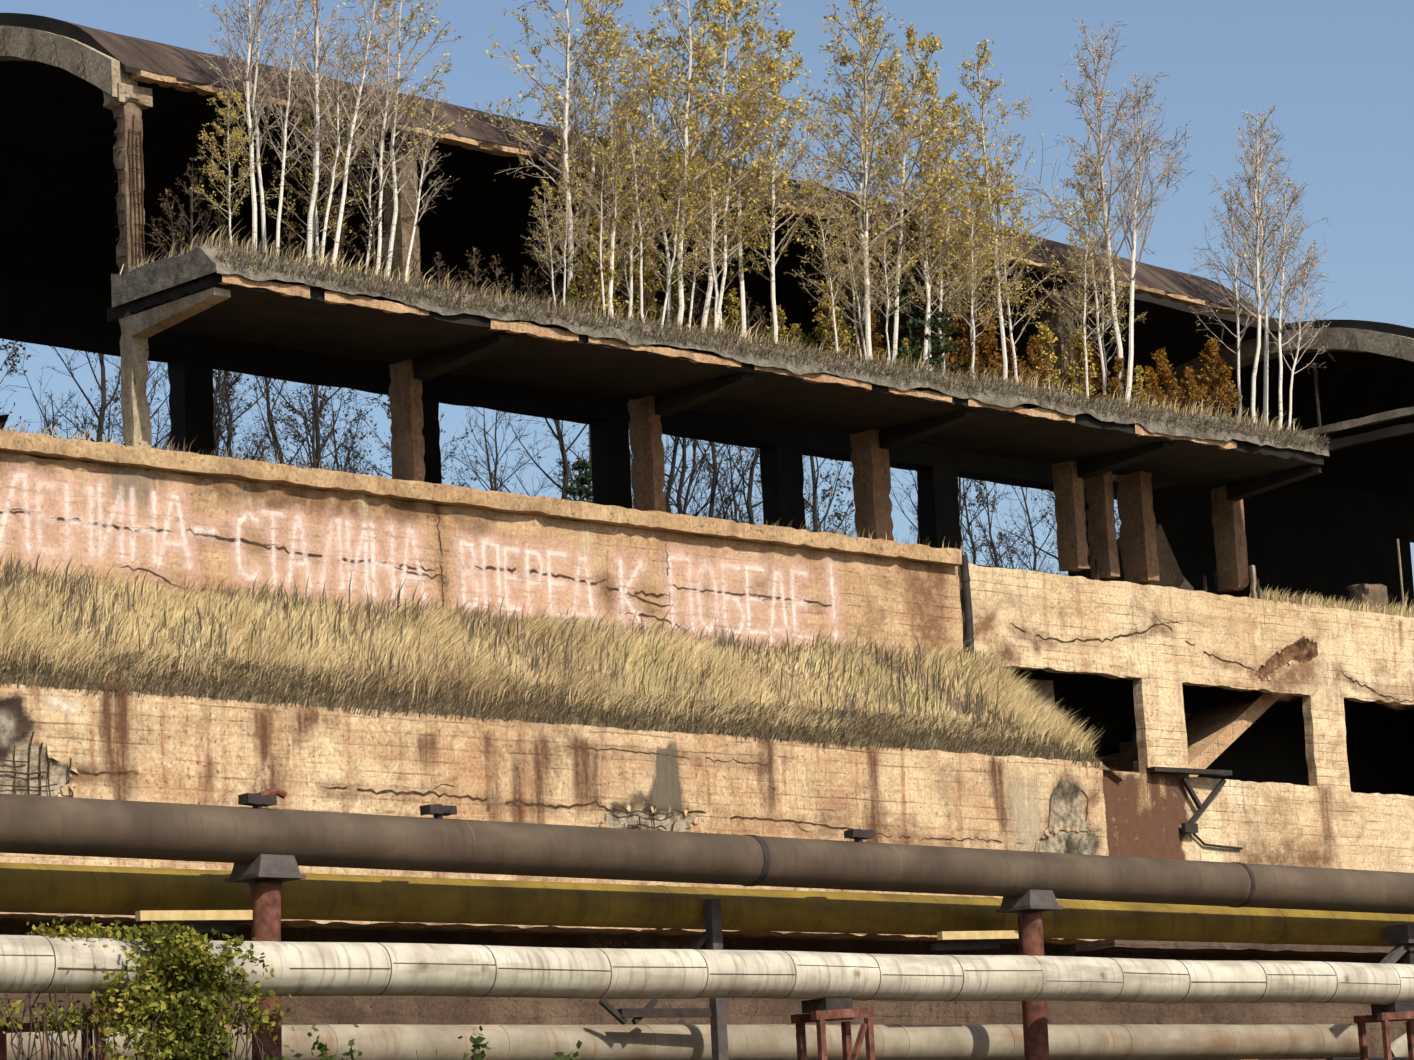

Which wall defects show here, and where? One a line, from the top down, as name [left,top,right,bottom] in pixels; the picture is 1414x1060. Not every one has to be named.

crack [0,504,836,629]
crack [1010,615,1253,670]
spalling [1255,636,1318,680]
crack [1340,670,1414,703]
spalling [0,694,79,797]
rust [100,681,128,800]
rust [256,712,275,808]
crack [325,784,612,811]
rust [514,741,547,823]
rust [574,737,596,806]
spalling [599,805,698,832]
spalling [1038,780,1099,855]